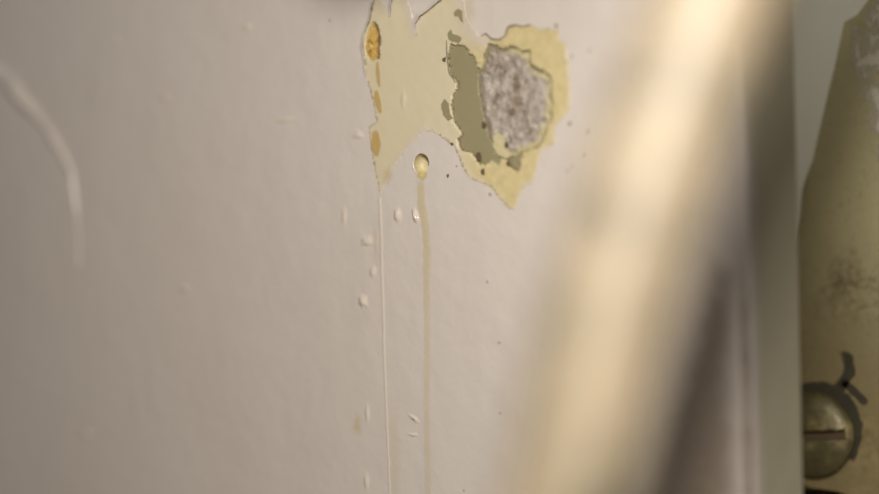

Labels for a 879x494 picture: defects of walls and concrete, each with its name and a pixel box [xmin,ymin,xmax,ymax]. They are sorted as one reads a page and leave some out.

rust [366,22,381,112]
peeling [359,0,573,210]